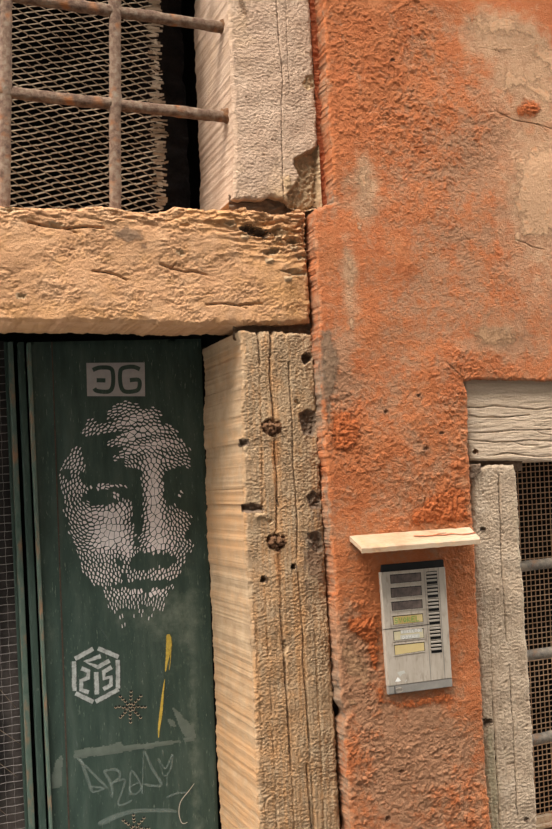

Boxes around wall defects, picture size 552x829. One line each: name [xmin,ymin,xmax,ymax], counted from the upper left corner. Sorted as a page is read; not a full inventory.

spalling [283,0,327,211]
spalling [224,220,307,282]